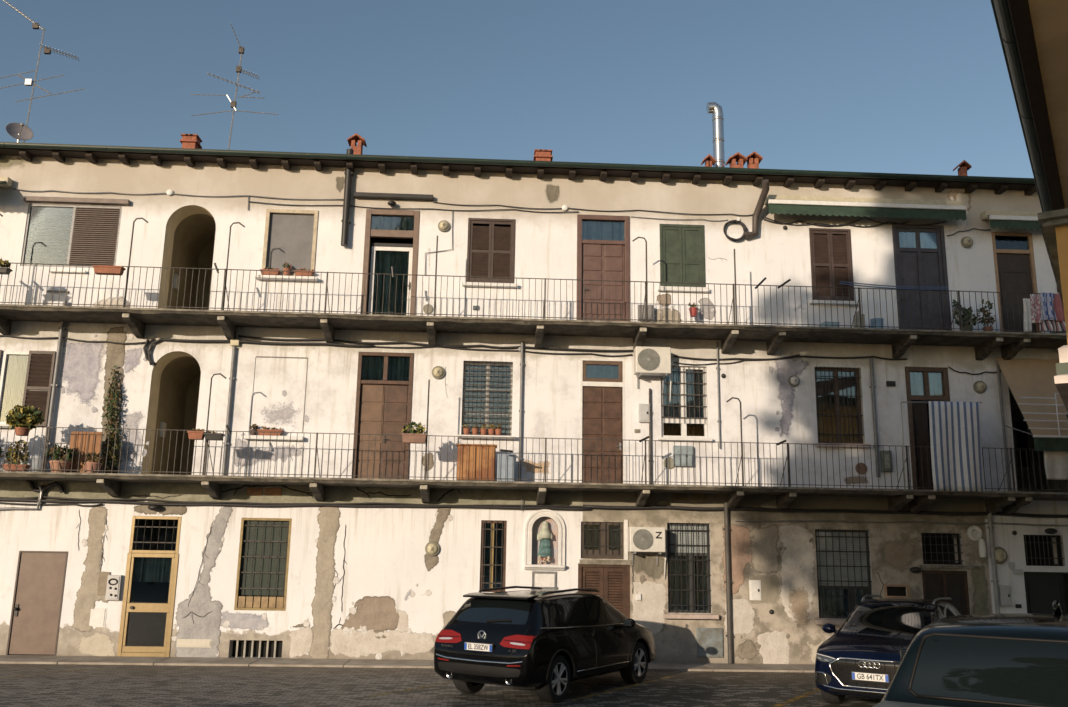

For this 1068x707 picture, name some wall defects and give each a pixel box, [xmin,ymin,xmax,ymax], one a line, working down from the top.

peeling [61,326,149,470]
peeling [769,352,810,436]
flaking render [71,506,109,632]
flaking render [171,506,268,657]
flaking render [289,506,455,659]
flaking render [717,524,816,664]